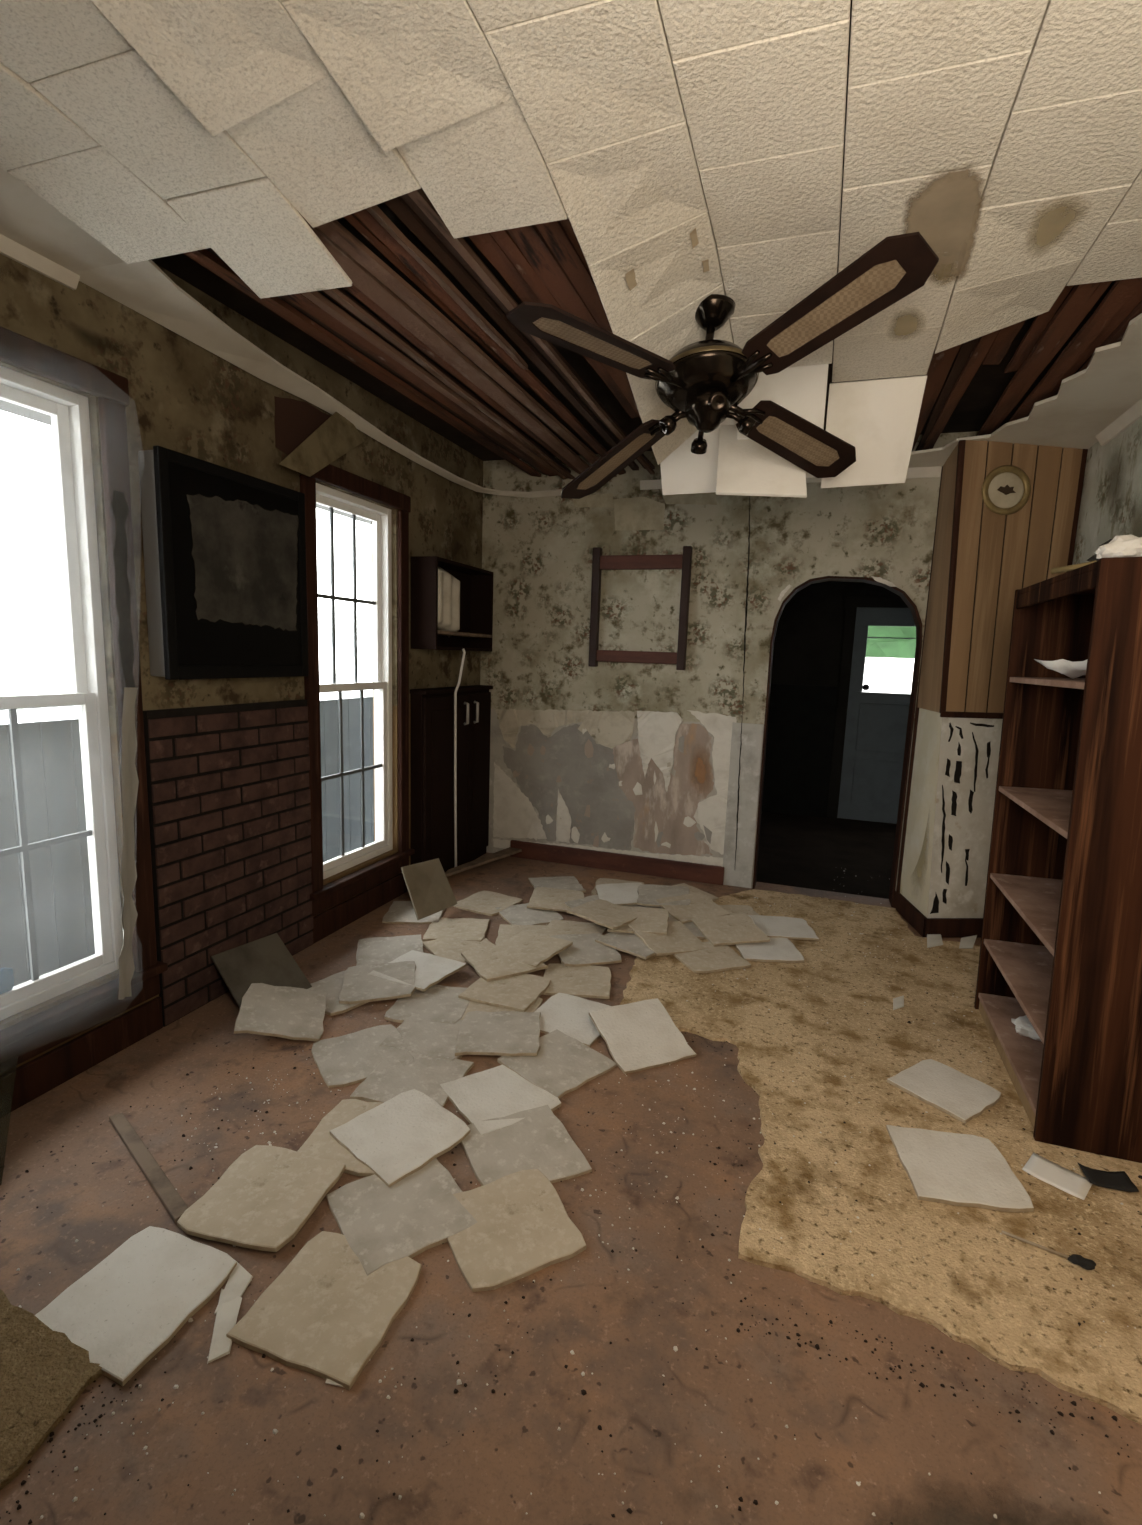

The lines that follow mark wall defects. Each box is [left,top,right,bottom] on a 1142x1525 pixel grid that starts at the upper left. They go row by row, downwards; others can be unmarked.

leakage [905,168,983,281]
leakage [1035,205,1077,247]
flaking render [183,188,641,480]
flaking render [882,277,1142,451]
flaking render [615,454,655,477]
peeling [493,709,737,867]